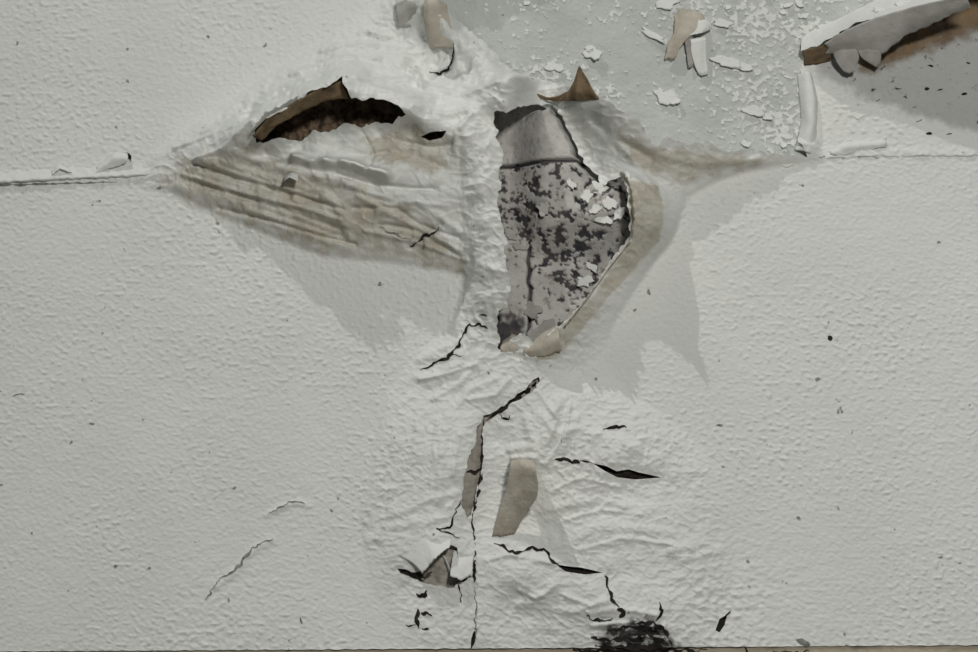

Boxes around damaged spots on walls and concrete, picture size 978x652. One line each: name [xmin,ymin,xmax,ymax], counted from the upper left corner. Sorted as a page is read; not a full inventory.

peeling [440,0,875,168]
water stain [184,161,266,220]
water stain [280,173,425,247]
flaking render [494,104,631,350]
crack [420,314,488,370]
crack [603,423,627,431]
crack [555,457,660,479]
crack [436,377,619,648]
crack [398,569,432,578]
water stain [587,602,674,652]